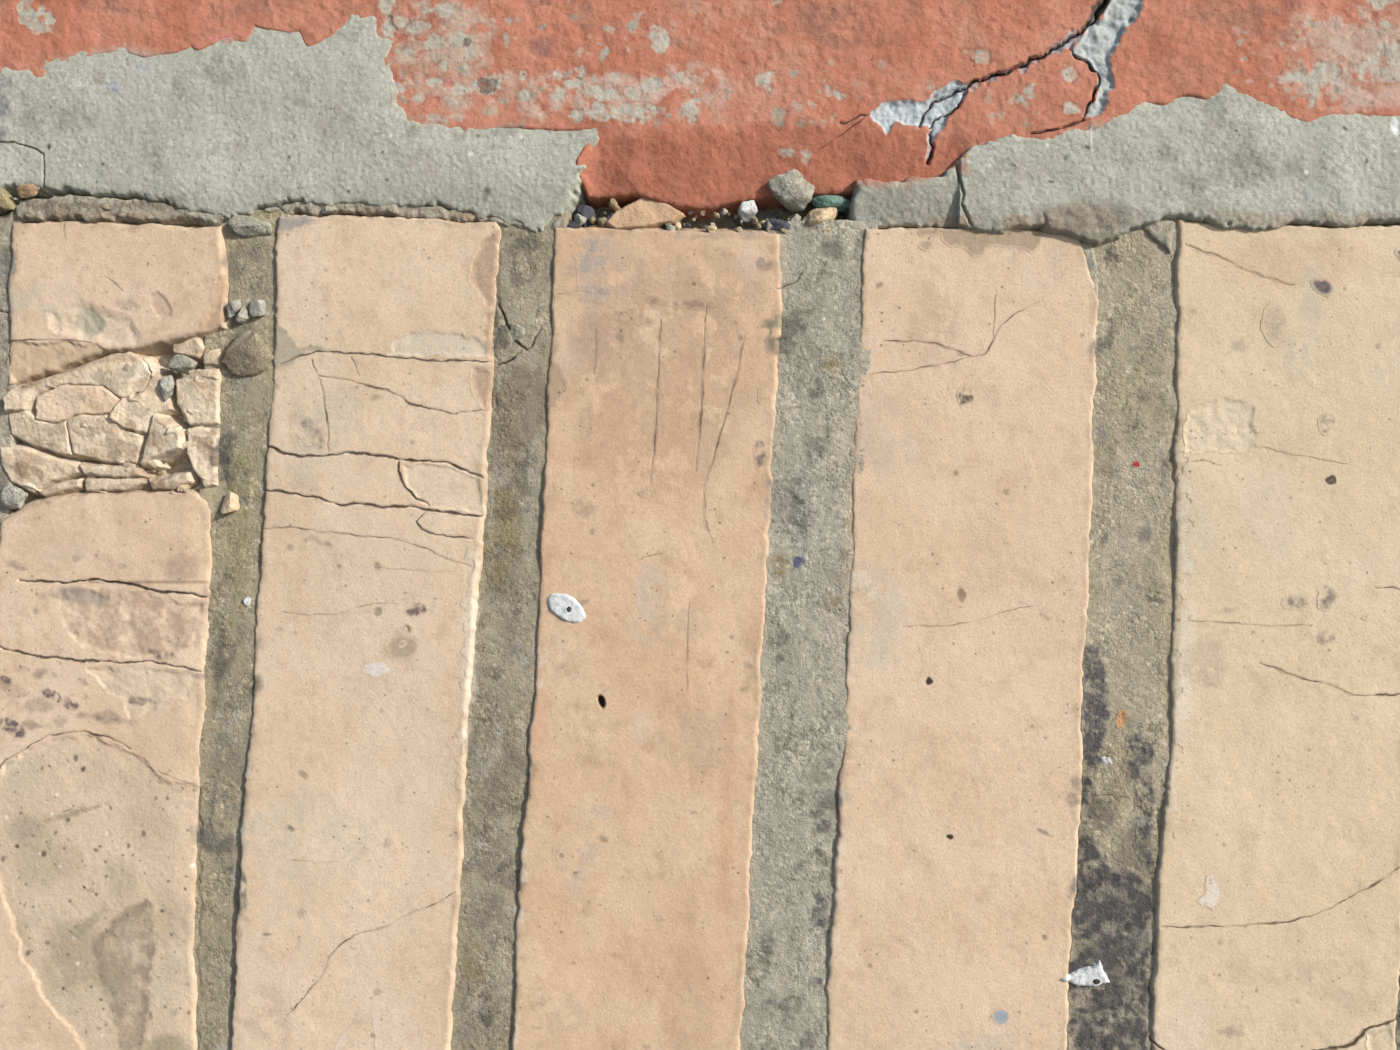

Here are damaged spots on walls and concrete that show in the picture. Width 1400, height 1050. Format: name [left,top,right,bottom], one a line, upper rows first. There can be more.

peeling [16,0,57,36]
peeling [376,0,533,111]
peeling [550,64,718,127]
peeling [647,22,672,56]
peeling [754,69,814,166]
crack [919,0,1108,225]
peeling [1272,42,1400,112]
crack [259,305,541,572]
crack [19,578,207,598]
crack [0,646,202,672]
crack [1162,867,1400,929]
crack [1312,1017,1396,1050]